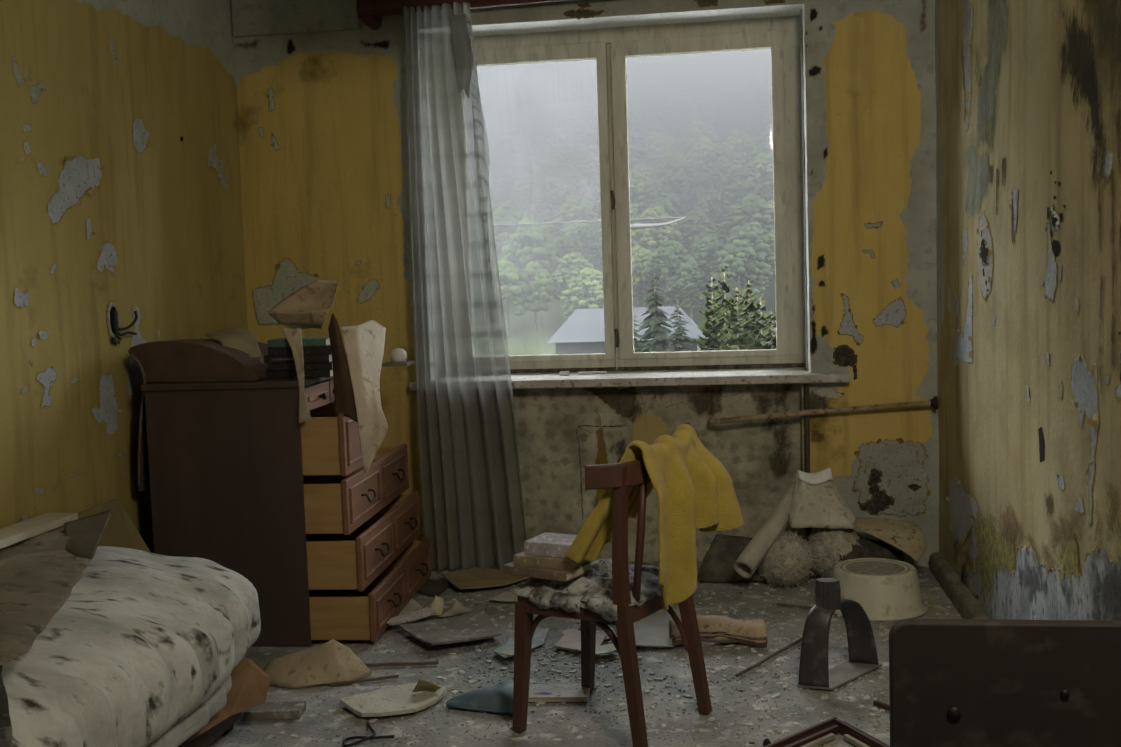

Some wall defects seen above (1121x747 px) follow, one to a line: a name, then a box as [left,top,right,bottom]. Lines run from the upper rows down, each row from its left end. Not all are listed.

peeling [20,123,104,225]
peeling [132,117,150,154]
leakage [1060,0,1121,367]
peeling [832,293,864,380]
peeling [872,278,906,328]
peeling [947,211,993,369]
peeling [1058,353,1121,526]
leakage [1018,563,1048,601]
flaking render [946,475,1121,621]
leakage [1087,565,1121,621]